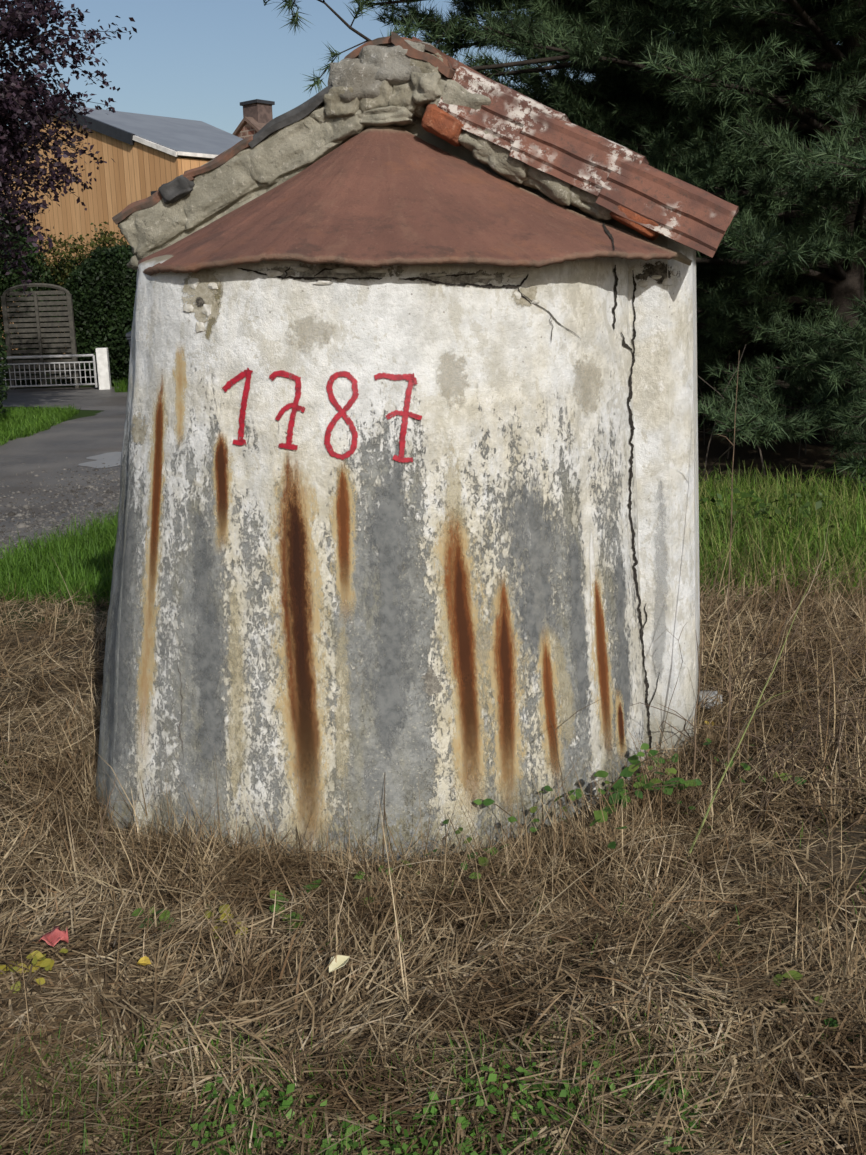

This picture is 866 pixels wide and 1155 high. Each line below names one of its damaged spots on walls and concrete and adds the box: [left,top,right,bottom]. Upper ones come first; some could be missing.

spalling [391,31,492,80]
spalling [182,269,222,333]
crack [237,267,580,341]
rust [137,351,187,717]
rust [212,436,233,540]
rust [268,460,356,825]
water stain [363,442,414,758]
rust [434,521,527,789]
water stain [503,477,601,712]
rust [590,582,627,754]
water stain [613,548,632,722]
crack [603,222,660,750]